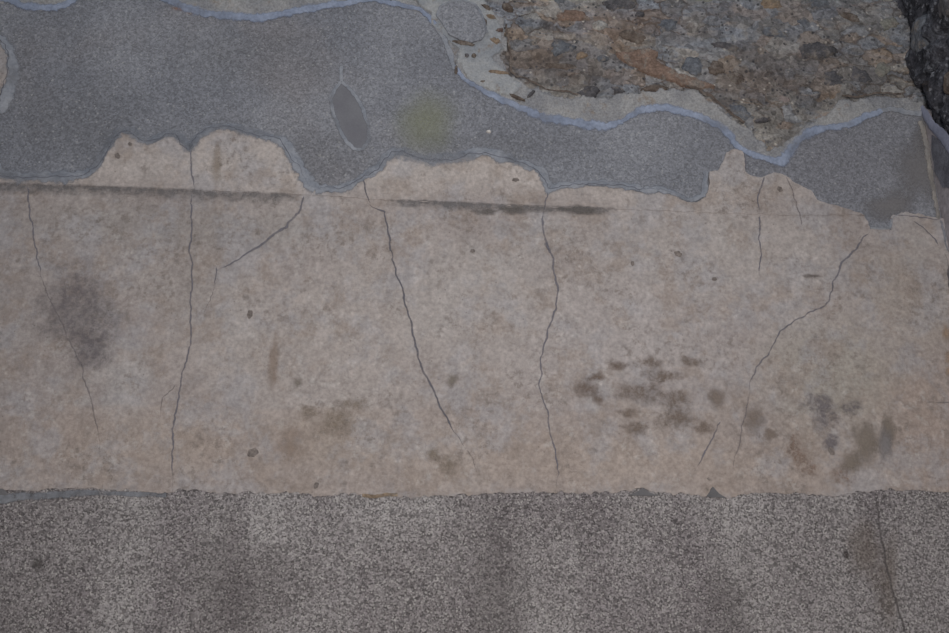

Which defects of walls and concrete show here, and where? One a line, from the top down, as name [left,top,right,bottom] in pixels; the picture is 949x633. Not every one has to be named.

spalling [0,0,949,230]
crack [171,150,304,469]
crack [363,181,453,430]
crack [538,193,559,469]
crack [751,234,867,379]